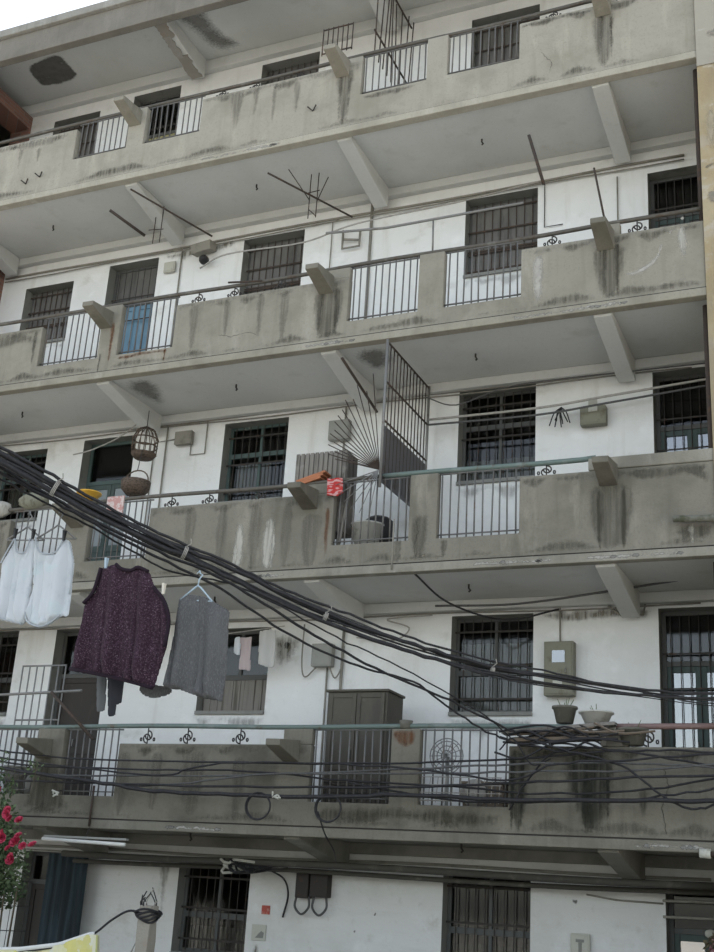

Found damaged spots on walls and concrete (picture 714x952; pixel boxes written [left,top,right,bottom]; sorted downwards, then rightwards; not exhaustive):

water stain [182,14,233,47]
water stain [30,56,76,85]
water stain [592,485,626,545]
water stain [232,526,243,568]
water stain [263,520,275,568]
water stain [569,756,610,827]